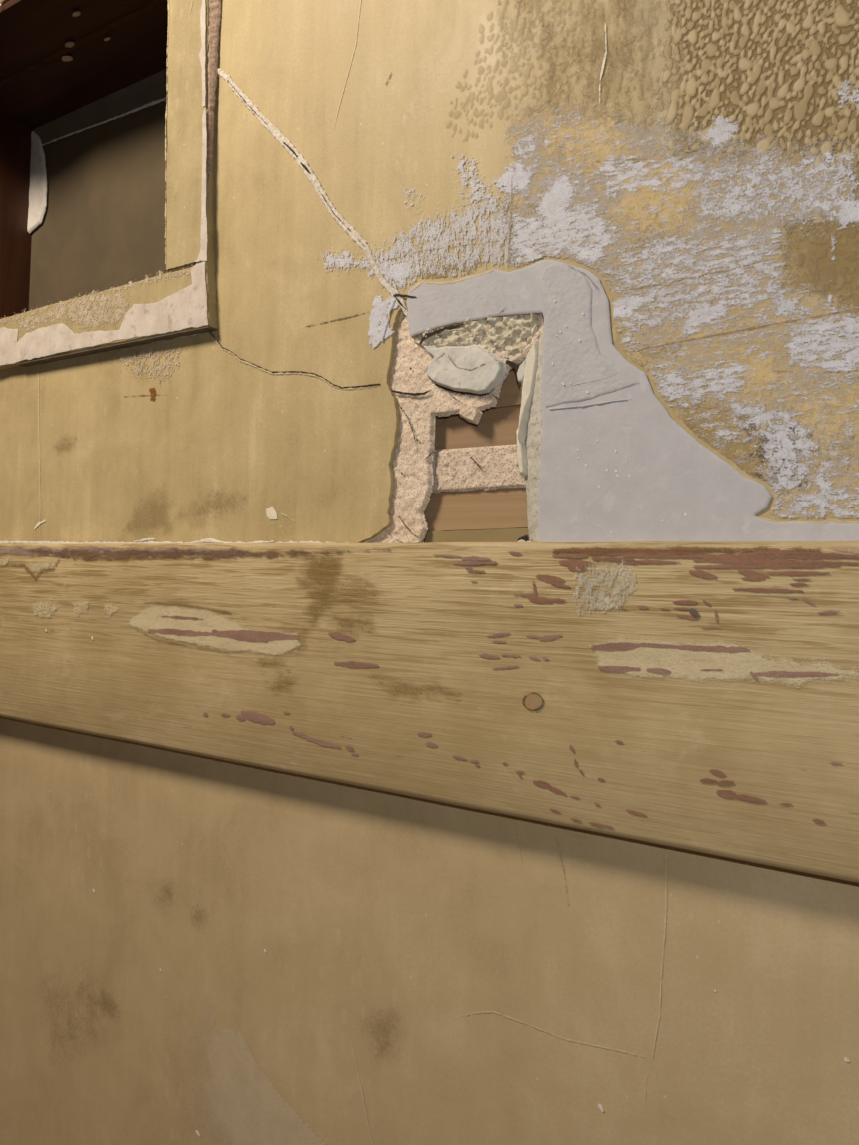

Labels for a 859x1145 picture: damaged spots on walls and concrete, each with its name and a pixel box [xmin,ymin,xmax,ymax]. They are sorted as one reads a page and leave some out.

peeling [837,79,859,113]
peeling [0,0,221,386]
crack [217,68,416,318]
damp [496,0,859,358]
crack [209,332,430,396]
peeling [0,95,859,583]
peeling [130,601,301,656]
peeling [479,632,548,669]
peeling [514,544,859,688]